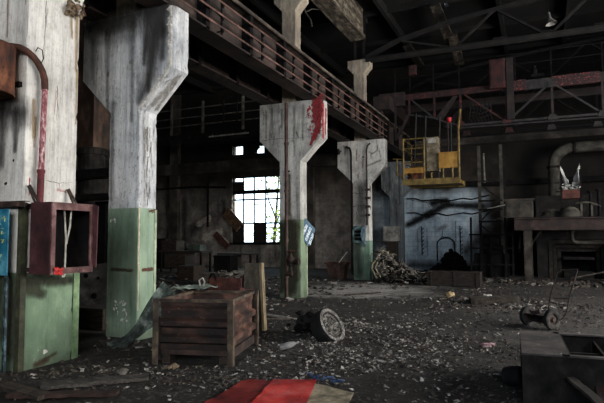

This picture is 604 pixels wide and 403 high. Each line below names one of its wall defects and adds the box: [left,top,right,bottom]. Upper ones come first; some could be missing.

leakage [156,8,165,59]
leakage [0,100,36,167]